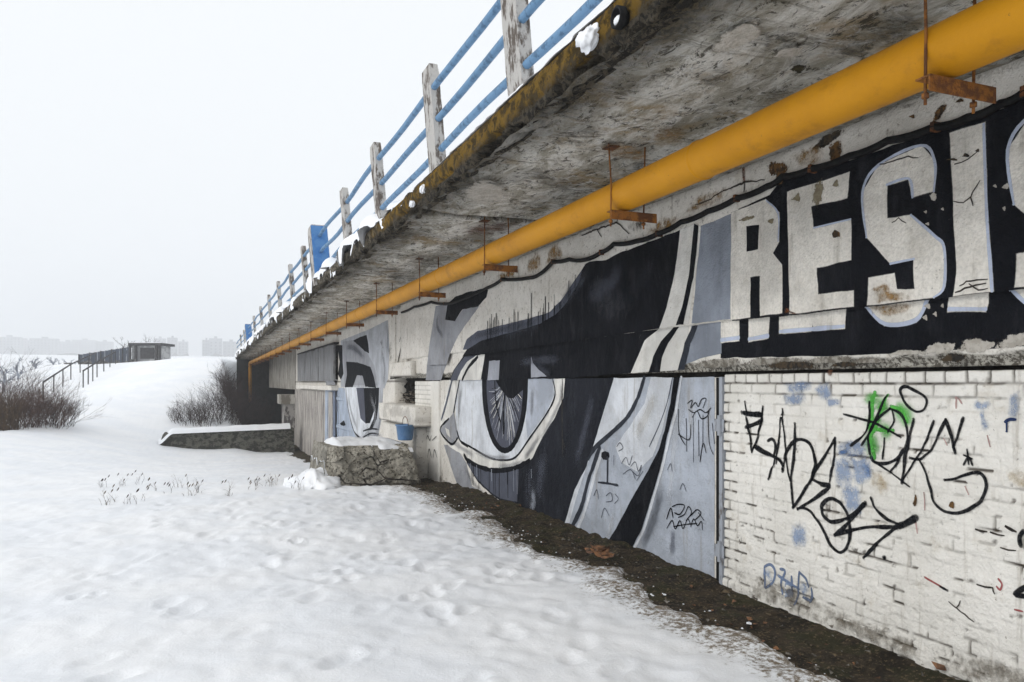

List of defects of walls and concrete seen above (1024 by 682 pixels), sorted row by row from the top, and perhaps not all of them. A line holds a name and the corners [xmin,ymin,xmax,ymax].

crack [953,180,980,206]
crack [955,279,988,293]
peeling [695,333,1024,369]